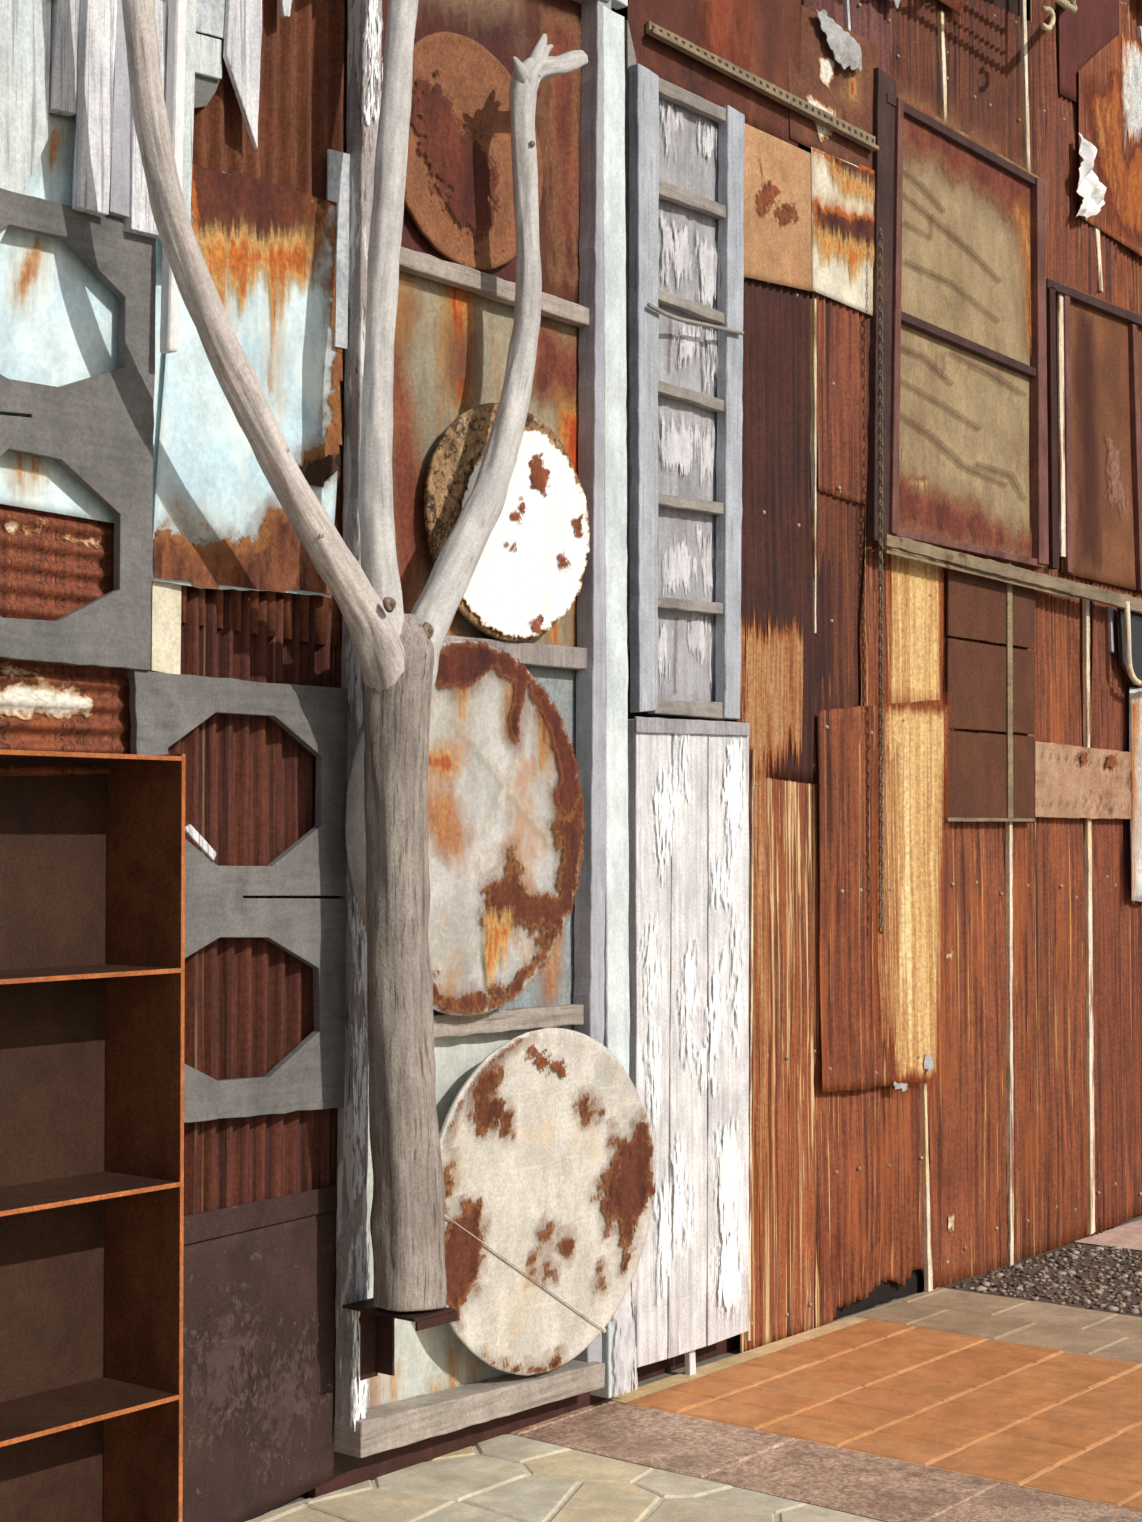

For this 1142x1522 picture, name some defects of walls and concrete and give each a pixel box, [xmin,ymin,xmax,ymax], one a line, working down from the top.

rust [410,69,500,243]
rust [756,147,875,281]
rust [1086,71,1142,245]
rust [191,163,343,469]
rust [532,317,579,476]
rust [511,452,552,524]
rust [572,514,584,537]
rust [428,614,585,1015]
rust [447,1037,570,1142]
rust [443,1161,491,1324]
rust [528,1220,575,1284]
rust [574,1091,656,1291]